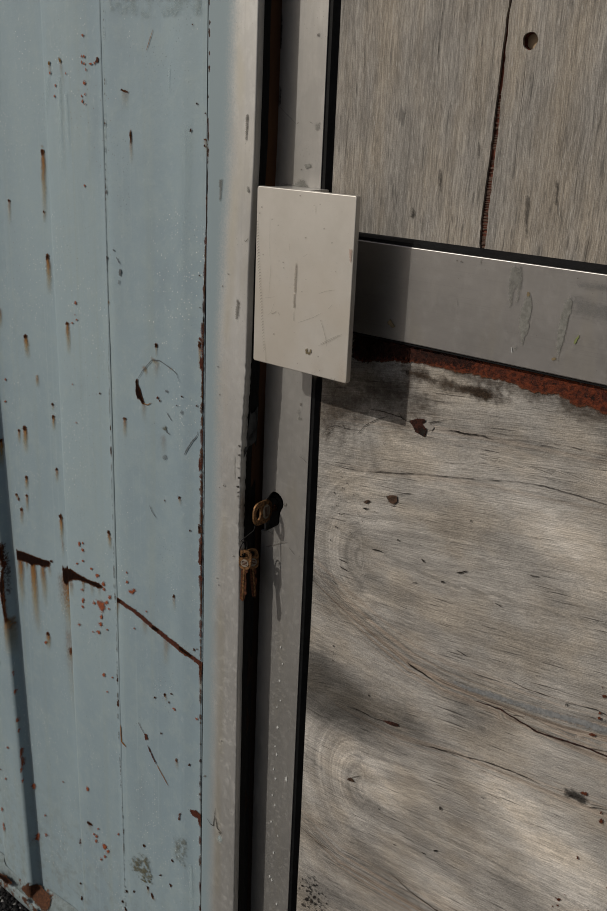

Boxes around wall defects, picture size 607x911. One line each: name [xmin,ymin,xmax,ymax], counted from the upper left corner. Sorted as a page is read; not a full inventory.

crack [481,0,512,248]
corrosion [352,333,607,414]
corrosion [114,113,209,911]
corrosion [0,543,52,635]
corrosion [62,565,102,613]
corrosion [0,873,51,911]